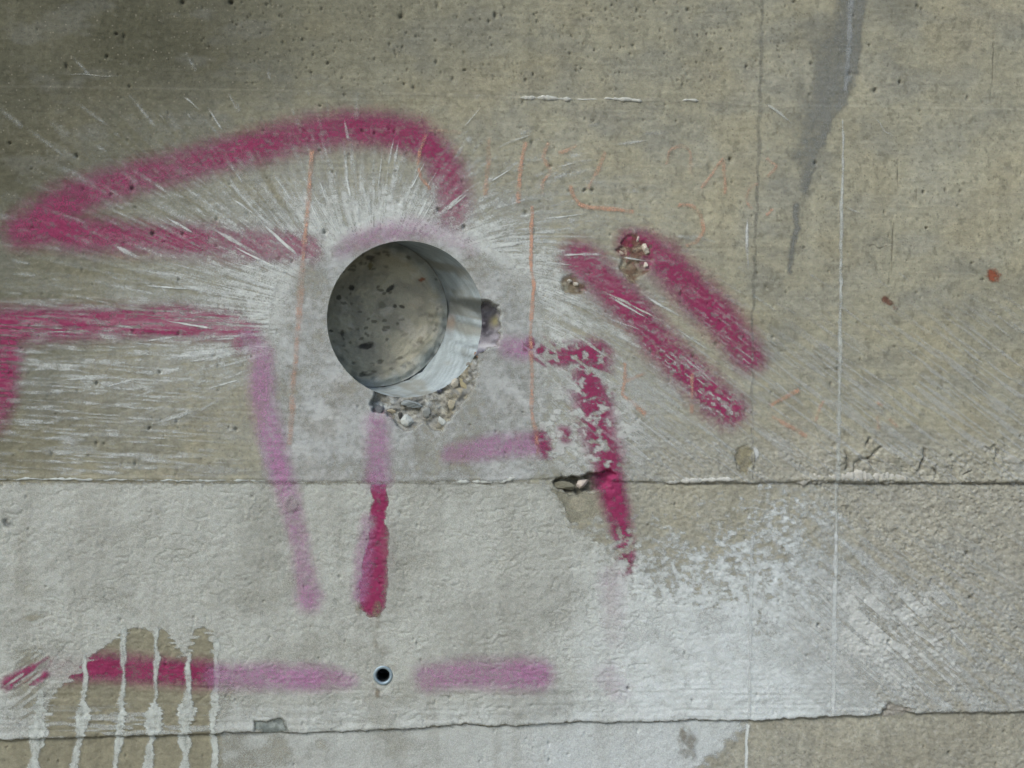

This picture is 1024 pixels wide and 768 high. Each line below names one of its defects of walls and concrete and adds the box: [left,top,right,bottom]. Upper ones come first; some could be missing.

damp [793,0,866,194]
spalling [617,235,649,283]
spalling [372,302,501,431]
damp [0,144,983,768]
peeling [553,470,608,523]